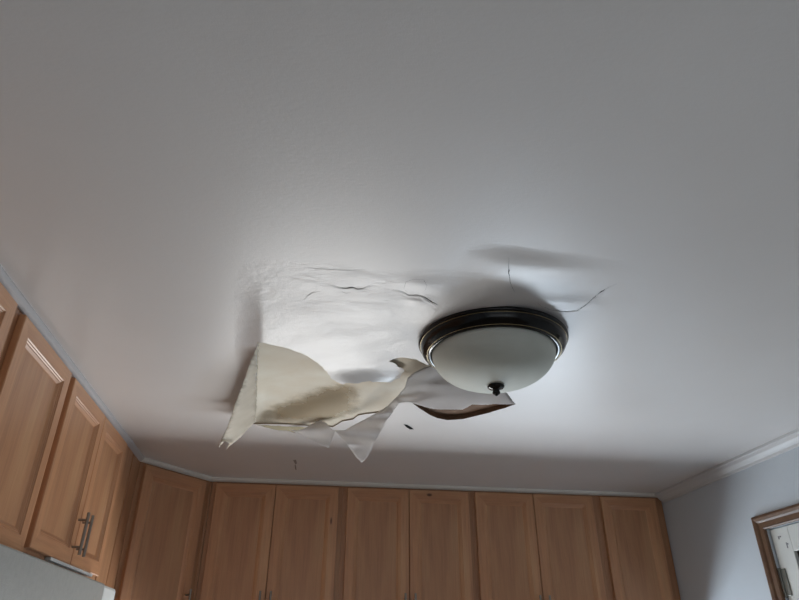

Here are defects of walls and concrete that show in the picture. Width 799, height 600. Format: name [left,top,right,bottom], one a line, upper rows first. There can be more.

crack [304,267,372,301]
crack [392,279,436,306]
crack [533,284,617,313]
peeling [219,342,514,462]